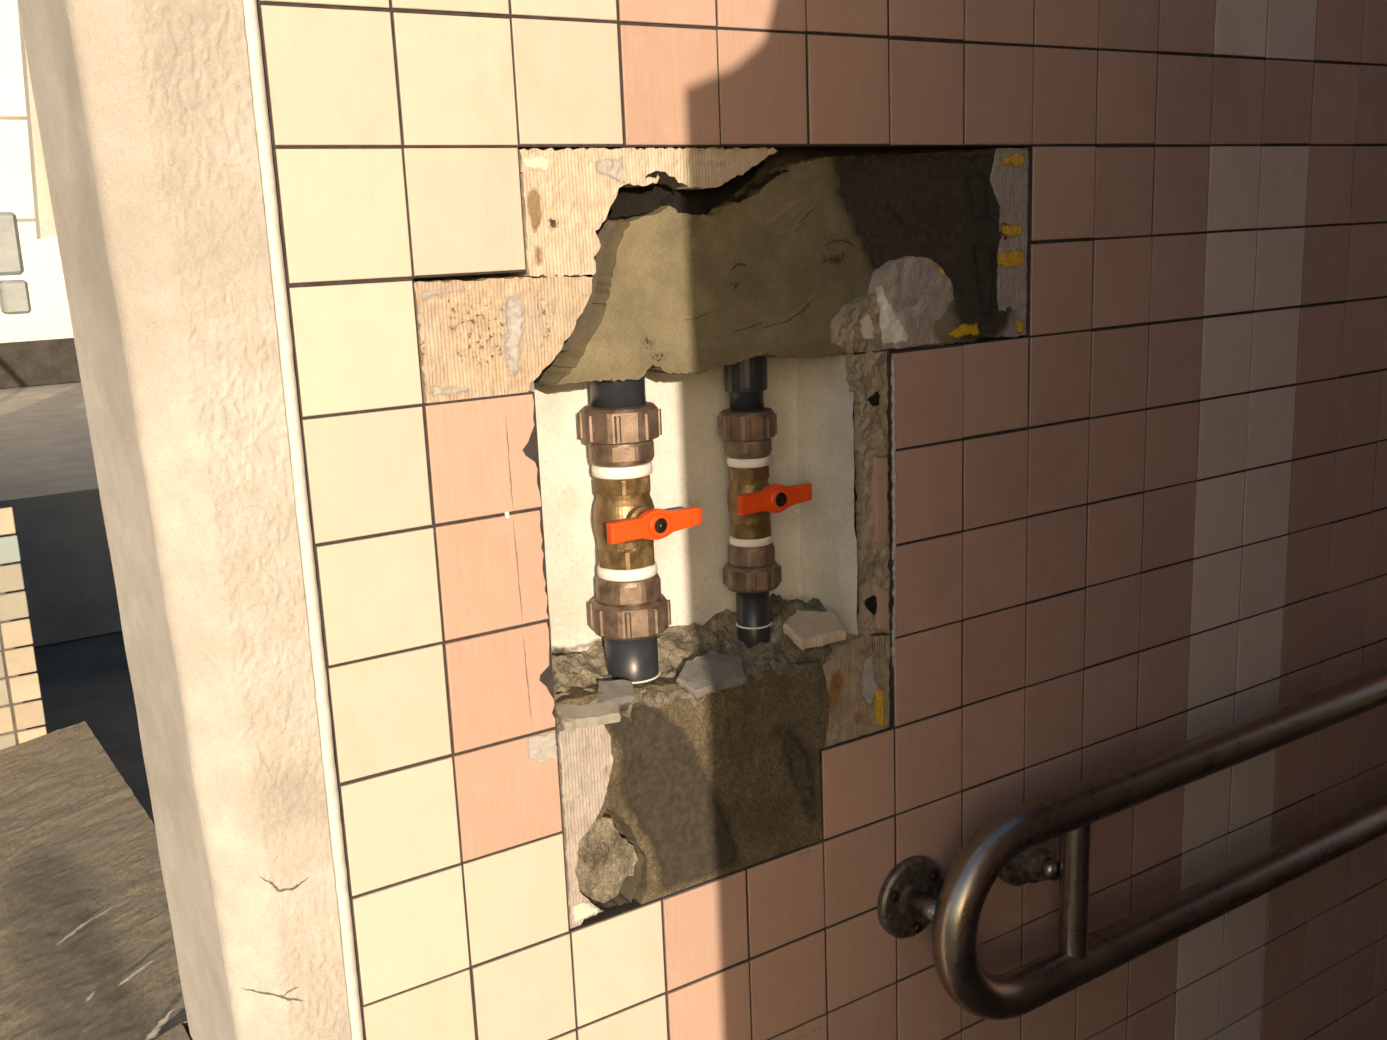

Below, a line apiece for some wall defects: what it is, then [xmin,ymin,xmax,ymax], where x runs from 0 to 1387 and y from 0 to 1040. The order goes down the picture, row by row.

spalling [413,147,777,403]
spalling [971,147,1029,338]
spalling [822,256,956,748]
crack [259,876,308,892]
spalling [557,725,644,929]
crack [241,987,305,1002]